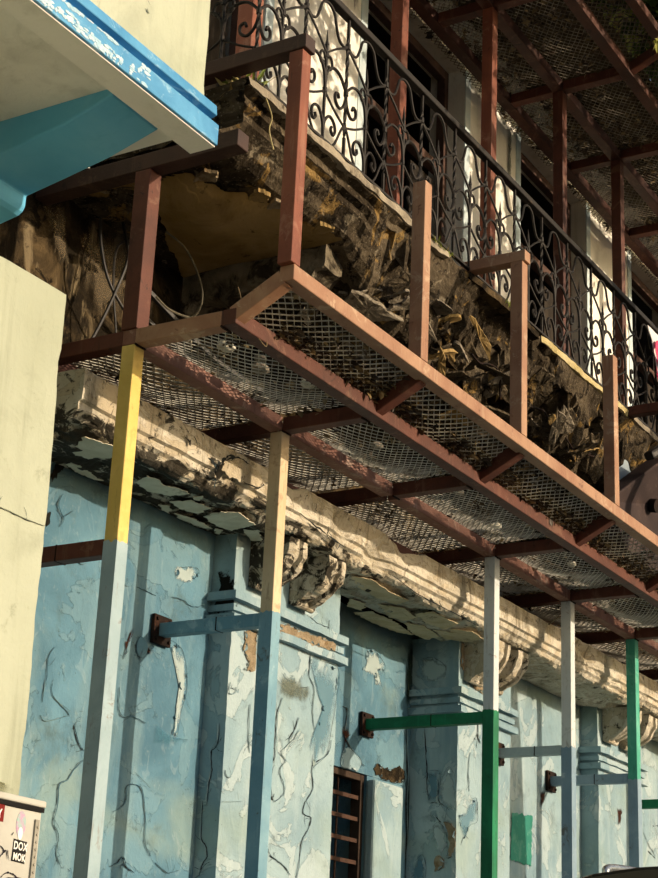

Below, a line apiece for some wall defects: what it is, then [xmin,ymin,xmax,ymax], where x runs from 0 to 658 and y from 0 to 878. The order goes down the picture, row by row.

peeling [40,0,151,88]
spalling [329,271,411,322]
spalling [428,287,510,425]
crack [0,494,72,527]
flaking render [135,475,263,541]
spalling [222,456,264,489]
crack [271,617,334,802]
crack [39,647,83,868]
crack [113,732,241,878]
crack [268,706,362,878]
flaking render [373,763,406,783]
crack [109,856,134,877]